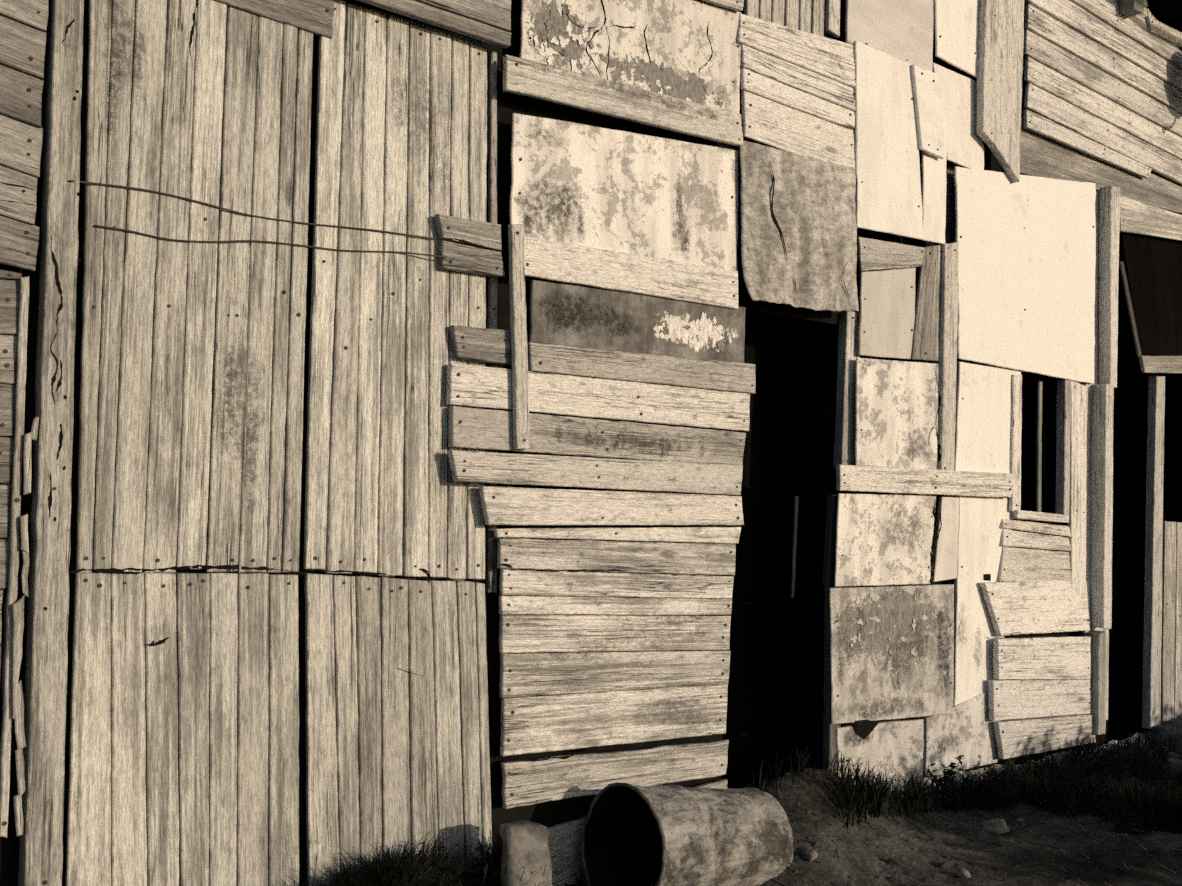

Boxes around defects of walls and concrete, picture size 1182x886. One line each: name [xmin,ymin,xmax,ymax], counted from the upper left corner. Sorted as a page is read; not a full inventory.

crack [565,0,651,79]
peeling [525,0,727,107]
crack [699,23,713,95]
peeling [654,311,738,352]
crack [48,236,63,518]
crack [69,563,648,583]
peeling [830,578,951,669]